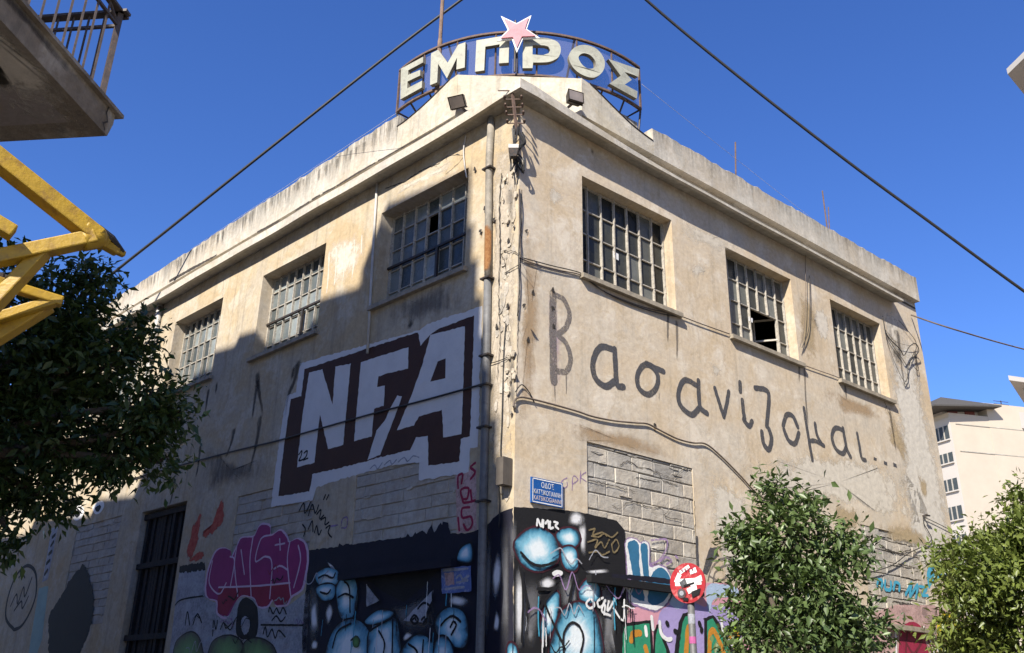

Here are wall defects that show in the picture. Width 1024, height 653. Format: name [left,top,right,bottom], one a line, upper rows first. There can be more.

rust [481,221,496,270]